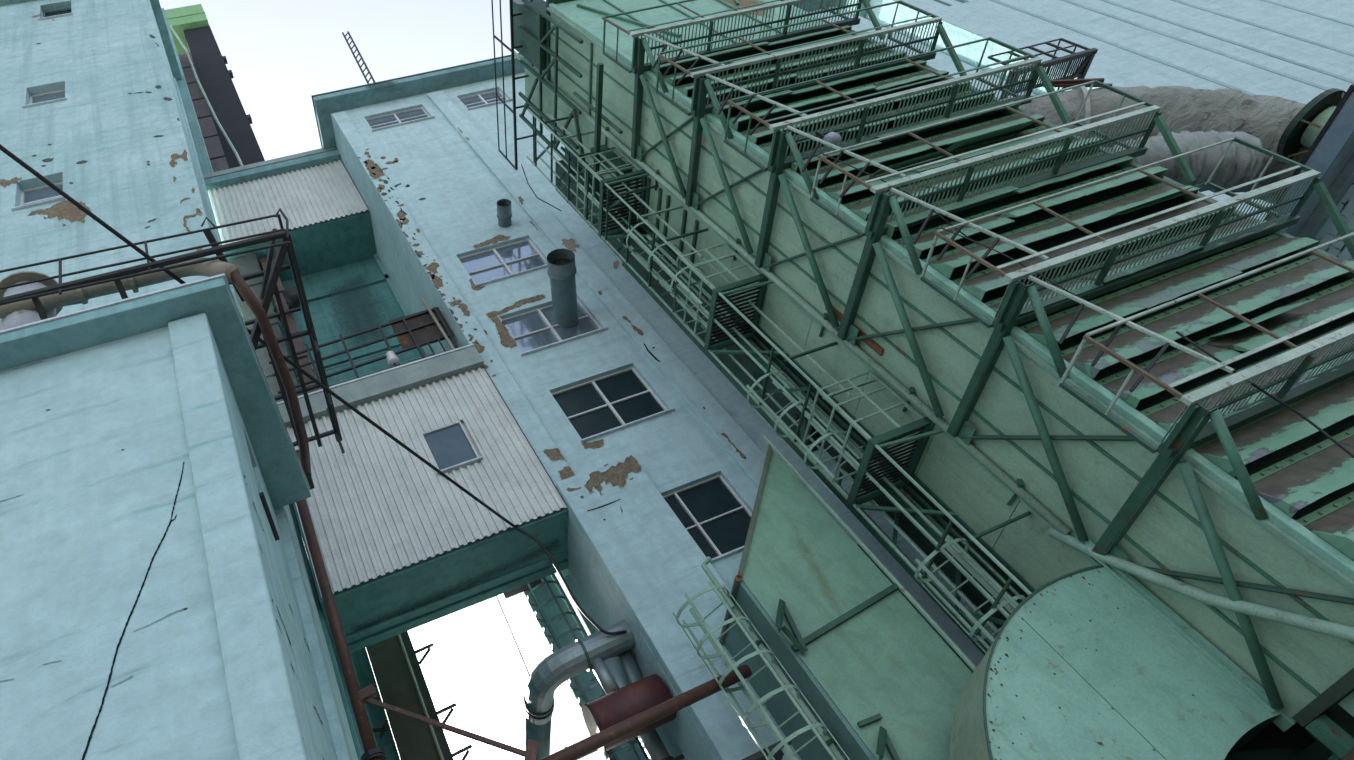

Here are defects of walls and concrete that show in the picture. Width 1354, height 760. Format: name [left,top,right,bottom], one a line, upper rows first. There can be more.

flaking render [169,150,189,182]
peeling [28,200,94,227]
flaking render [180,188,202,232]
flaking render [358,149,545,377]
peeling [582,439,605,450]
flaking render [542,447,642,499]
crack [81,462,188,760]